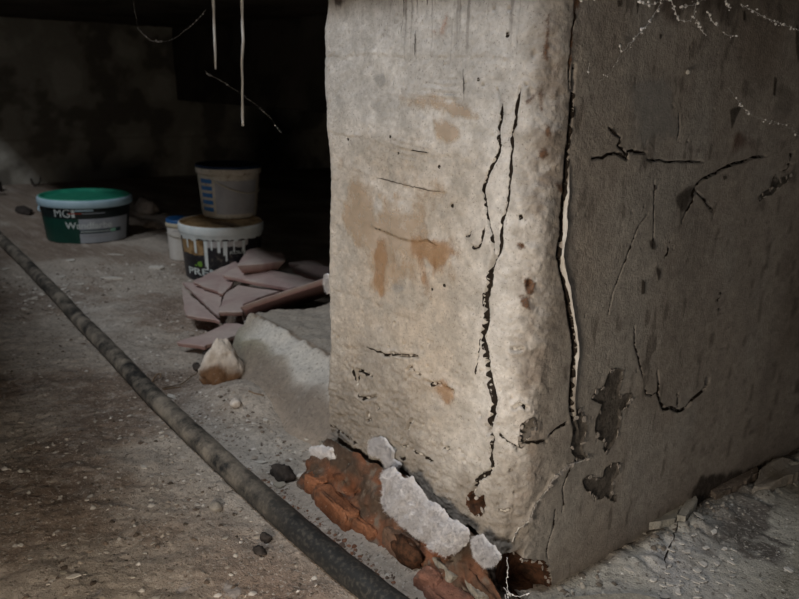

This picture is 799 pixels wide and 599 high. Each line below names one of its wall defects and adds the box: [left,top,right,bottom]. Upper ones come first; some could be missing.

crack [591,127,761,212]
crack [466,3,579,491]
crack [608,185,656,312]
crack [634,329,707,413]
leakage [309,444,335,460]
leakage [367,436,502,570]
peeling [571,368,633,502]